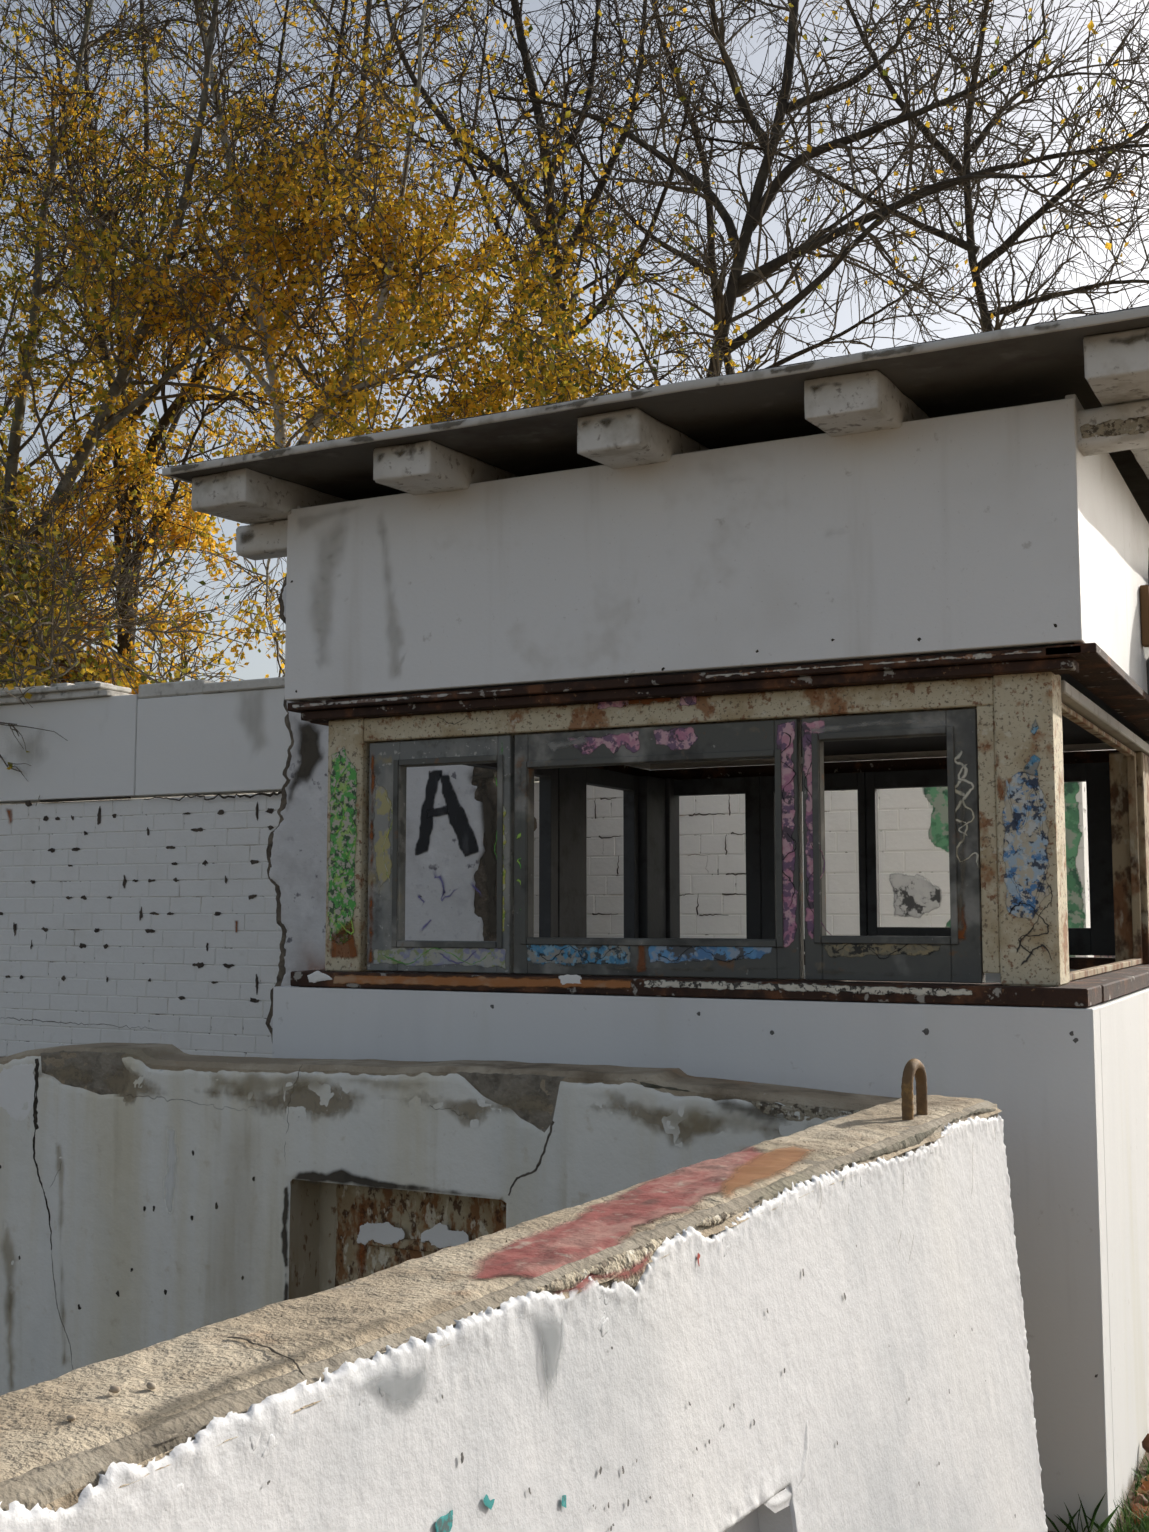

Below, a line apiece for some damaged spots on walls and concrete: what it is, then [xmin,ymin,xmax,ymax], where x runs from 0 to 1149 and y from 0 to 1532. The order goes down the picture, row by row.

corrosion [622,697,673,707]
crack [14,1018,154,1030]
spalling [40,1050,126,1095]
spalling [457,1072,565,1132]
spalling [748,1100,861,1121]
crack [508,1121,554,1196]
spalling [834,1108,996,1196]
crack [33,1059,73,1368]
peeling [319,1182,335,1292]
peeling [357,1222,469,1248]
spalling [536,1235,667,1349]
peeling [435,1510,453,1532]